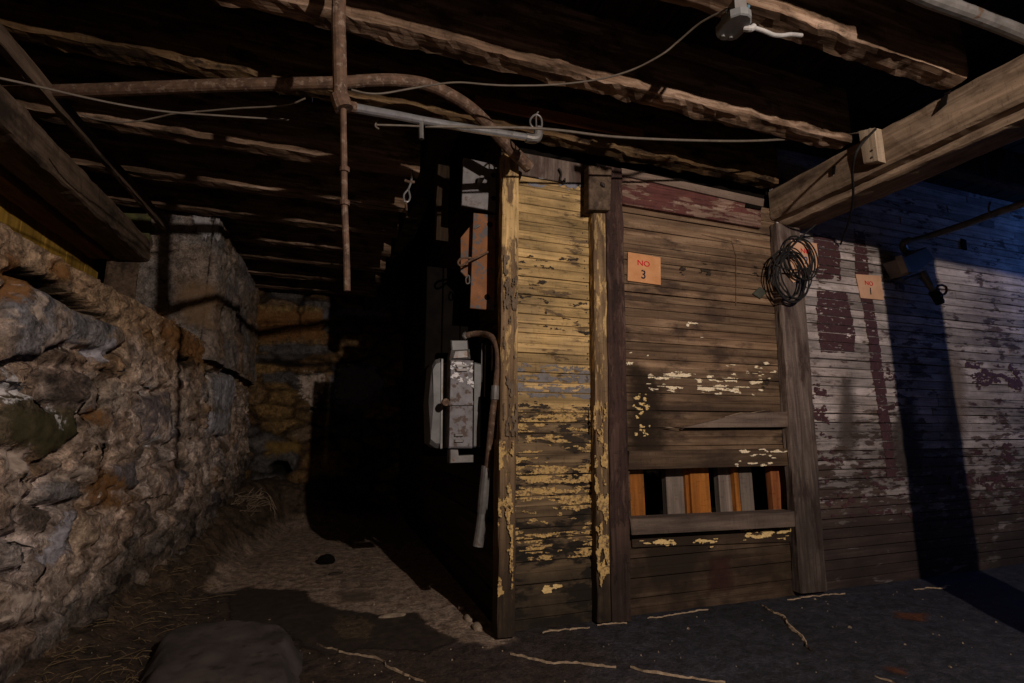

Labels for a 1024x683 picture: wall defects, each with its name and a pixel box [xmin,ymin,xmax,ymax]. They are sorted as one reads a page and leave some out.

peeling [497,255,610,597]
peeling [633,362,776,436]
peeling [812,383,843,484]
peeling [872,365,914,418]
peeling [965,361,1023,392]
peeling [821,442,1024,520]
peeling [740,527,791,540]
crack [760,593,845,651]